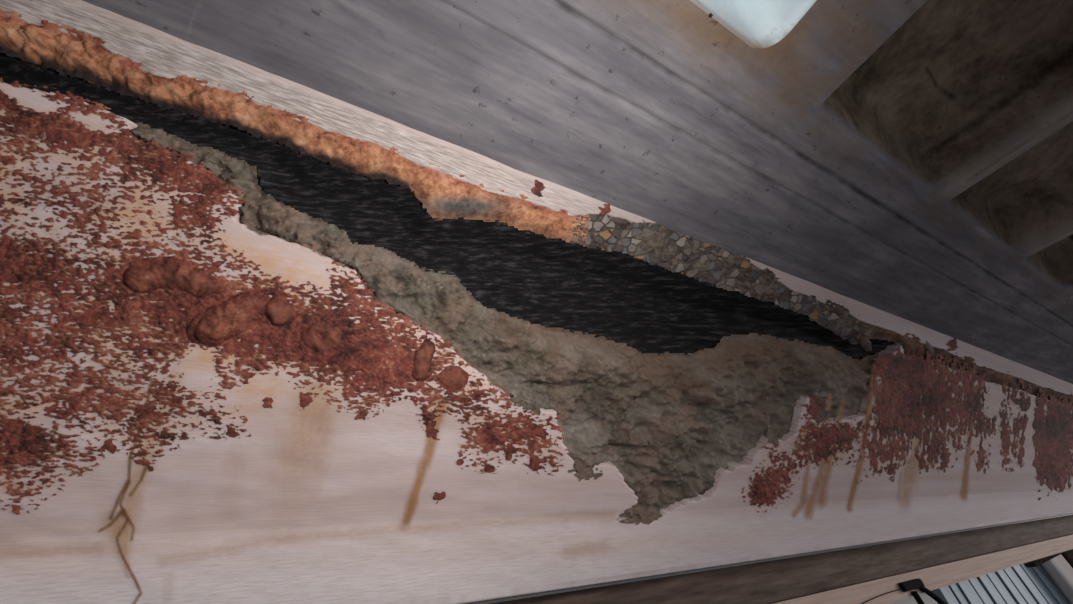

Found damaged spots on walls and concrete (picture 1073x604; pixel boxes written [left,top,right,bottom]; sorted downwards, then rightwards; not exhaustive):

spalling [0,8,590,253]
rust [531,180,545,197]
crack [100,381,153,604]
rust [406,399,446,522]
spalling [0,121,879,525]
peeling [572,213,1073,496]
rust [848,366,875,511]
rust [962,425,972,498]